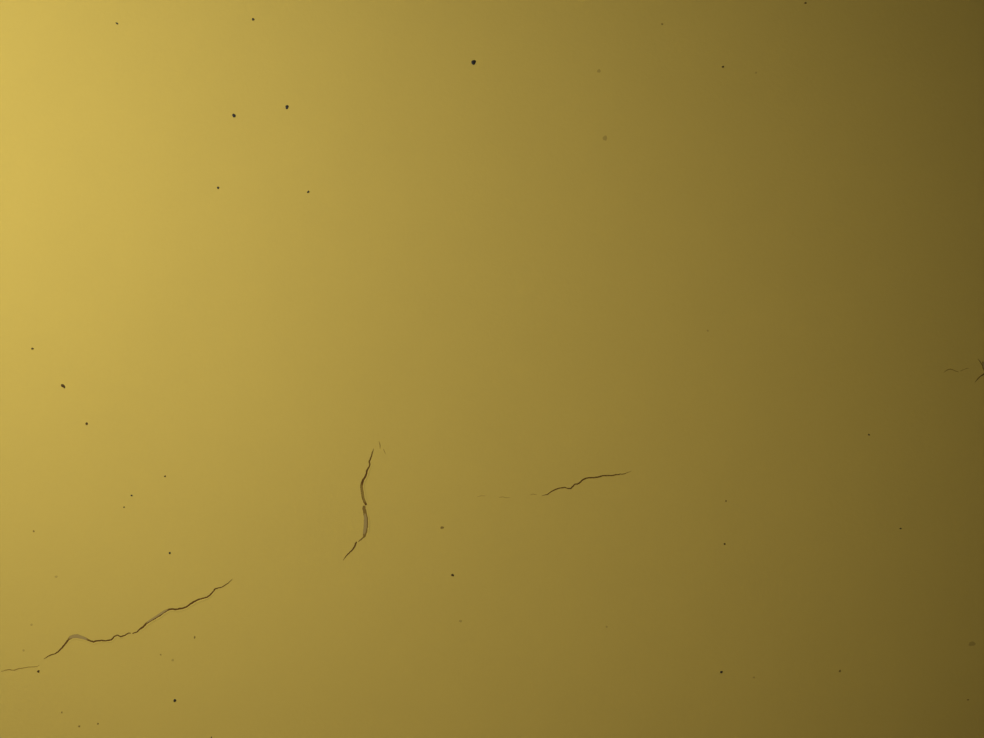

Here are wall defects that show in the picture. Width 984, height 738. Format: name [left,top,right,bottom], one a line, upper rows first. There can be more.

crack [344,442,385,559]
crack [504,471,631,498]
crack [1,581,230,672]